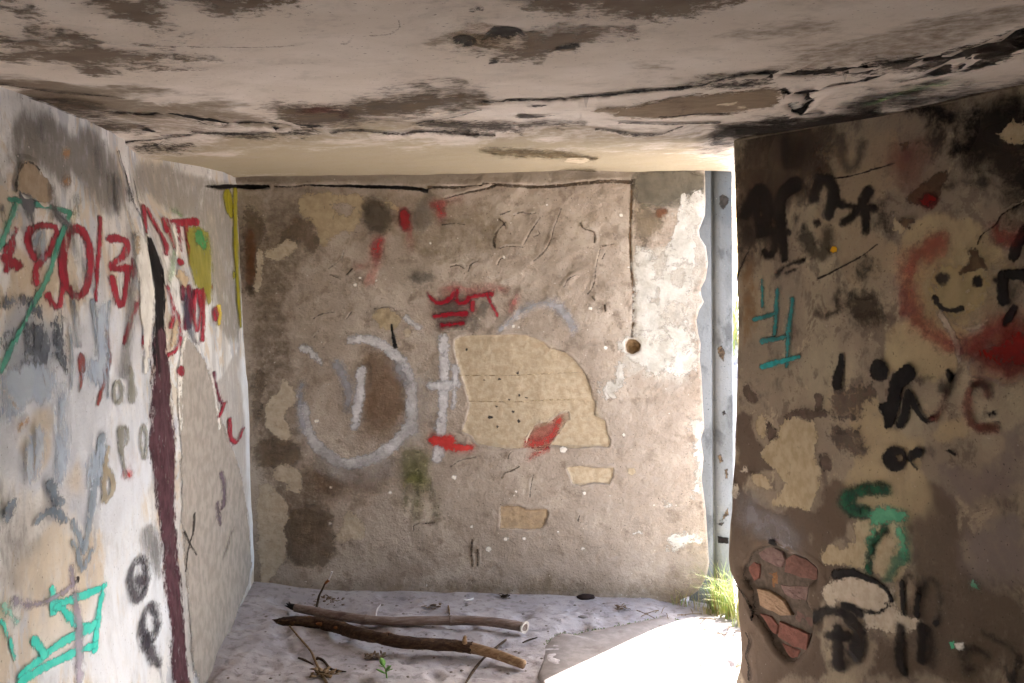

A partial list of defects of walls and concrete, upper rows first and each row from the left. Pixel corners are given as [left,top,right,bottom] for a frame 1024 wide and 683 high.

damp [466,0,746,65]
crack [0,22,1024,232]
spalling [4,153,56,209]
crack [201,174,637,338]
spalling [451,190,704,500]
damp [251,370,267,420]
damp [253,438,302,469]
peeling [740,380,877,512]
damp [282,504,336,568]
spalling [496,491,559,541]
peeling [666,531,703,552]
spalling [733,508,920,673]